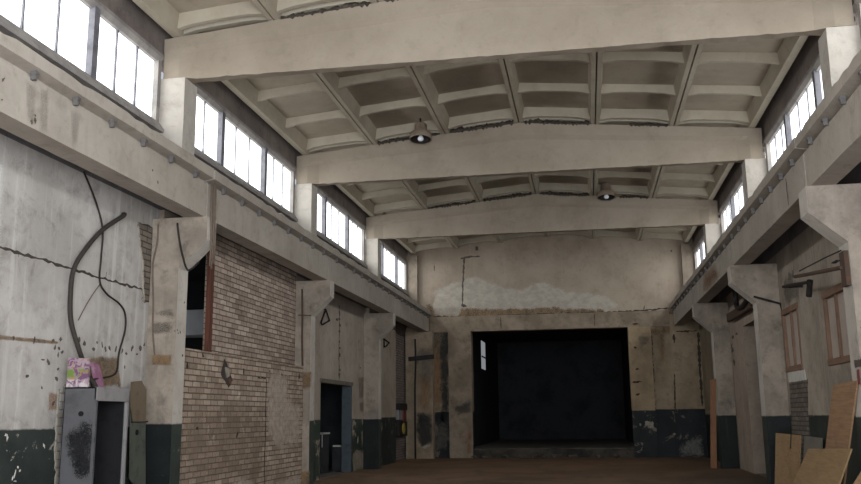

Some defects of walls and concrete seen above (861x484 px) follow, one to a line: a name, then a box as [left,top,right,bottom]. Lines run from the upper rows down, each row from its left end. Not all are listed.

crack [0,246,143,300]
damp [414,276,618,456]
spalling [788,369,810,466]